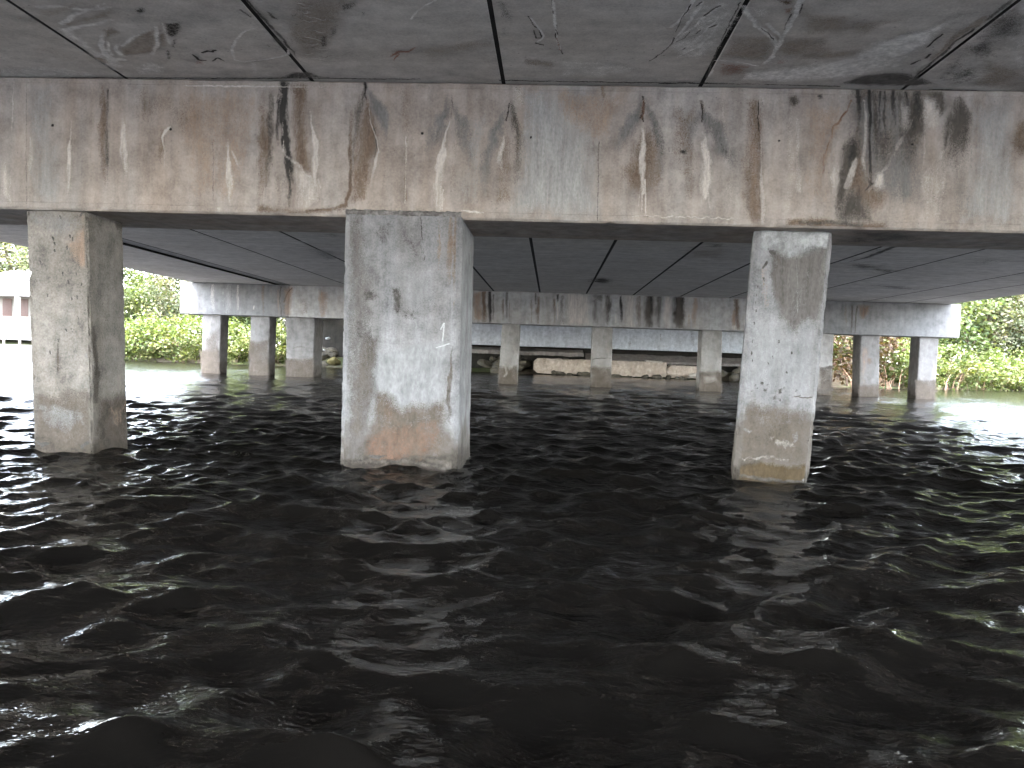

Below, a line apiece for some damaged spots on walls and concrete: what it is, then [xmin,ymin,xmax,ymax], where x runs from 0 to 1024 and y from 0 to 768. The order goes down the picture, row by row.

leakage [0,0,413,214]
leakage [384,0,1024,362]
corrosion [363,386,450,468]